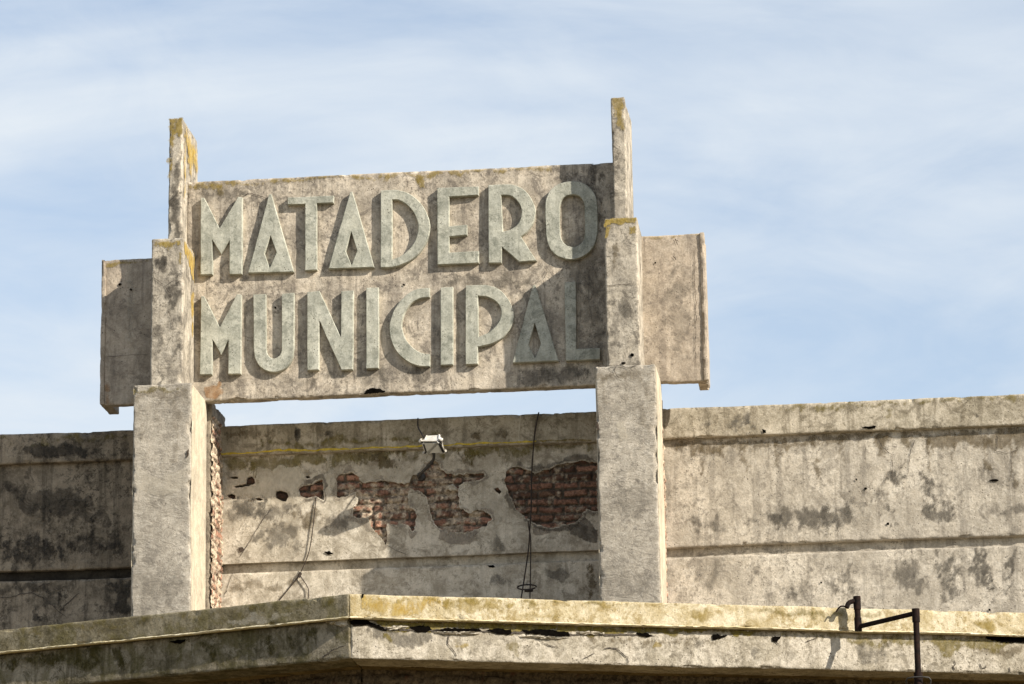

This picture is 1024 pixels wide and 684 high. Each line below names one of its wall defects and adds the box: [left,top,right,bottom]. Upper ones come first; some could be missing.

damp [23,443,97,458]
damp [0,489,123,564]
spalling [228,477,255,499]
spalling [276,455,598,548]
damp [748,500,856,531]
damp [897,548,1016,602]
damp [109,580,131,615]